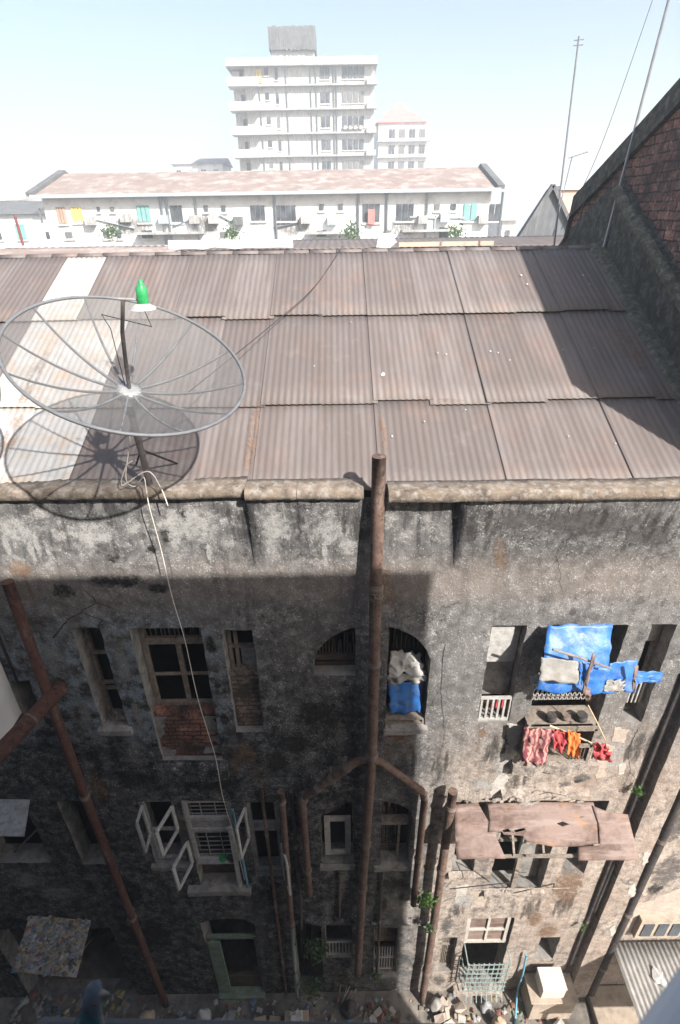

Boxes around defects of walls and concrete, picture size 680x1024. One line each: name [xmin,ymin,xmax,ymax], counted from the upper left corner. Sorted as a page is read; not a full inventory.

leakage [0,515,52,563]
leakage [79,518,141,556]
leakage [148,508,291,563]
leakage [314,515,370,566]
leakage [90,575,169,593]
leakage [540,870,583,936]